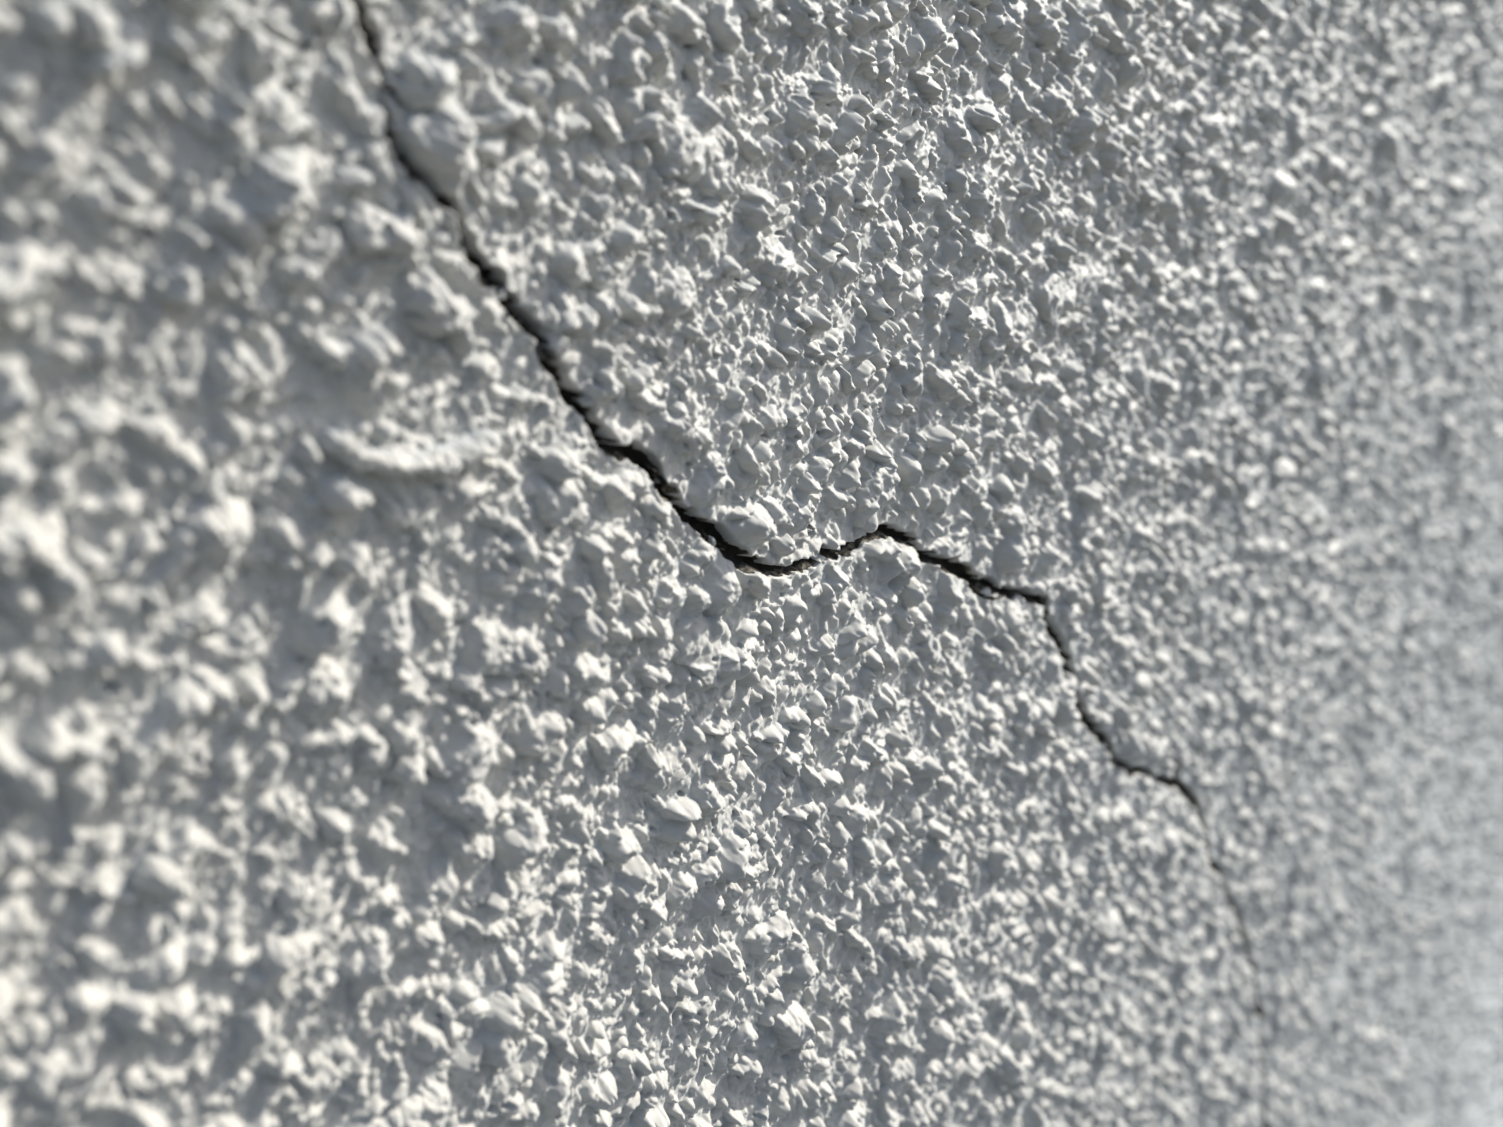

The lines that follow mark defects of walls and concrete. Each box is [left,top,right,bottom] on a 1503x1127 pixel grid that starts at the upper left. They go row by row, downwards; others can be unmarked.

crack [351,1,1269,1127]